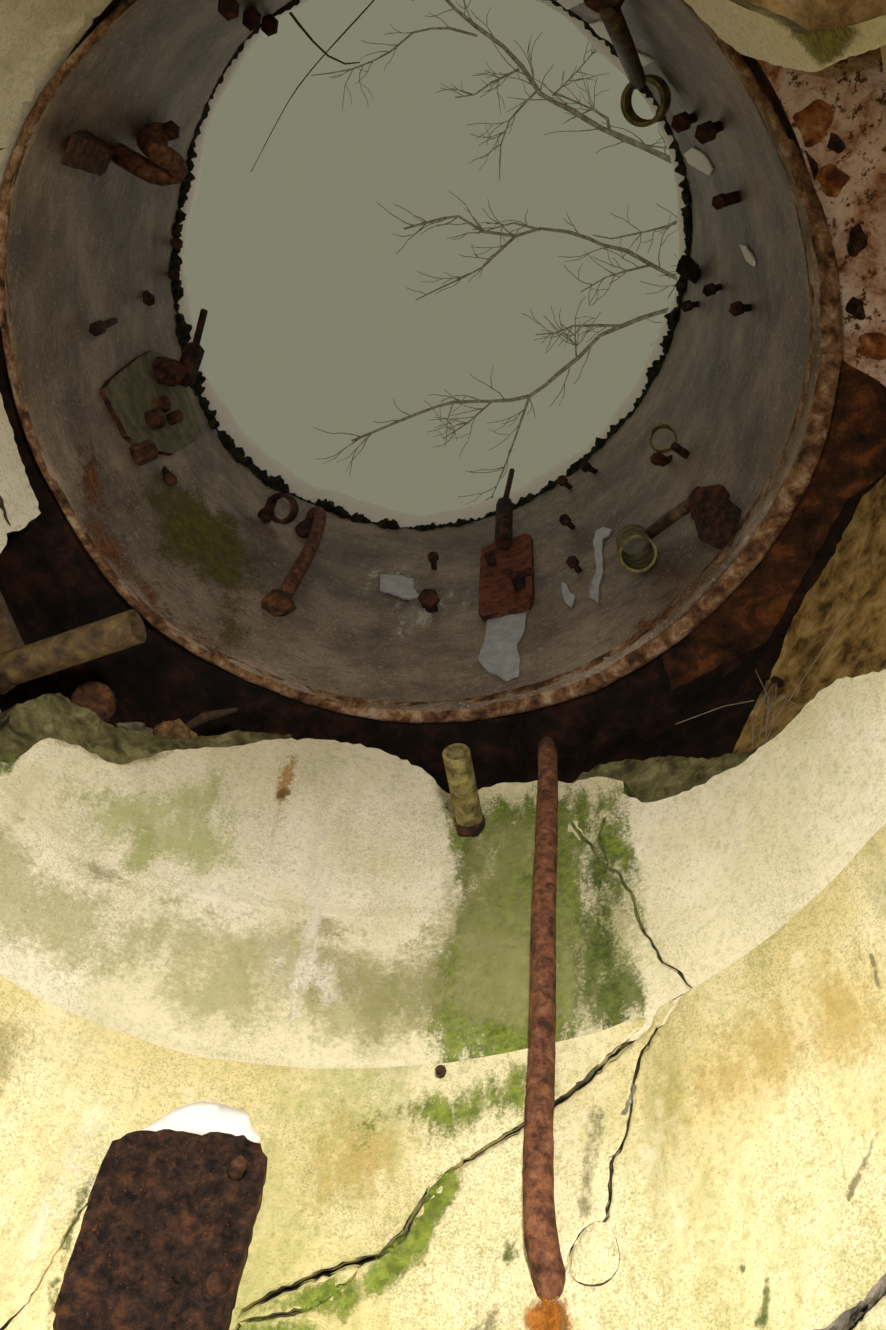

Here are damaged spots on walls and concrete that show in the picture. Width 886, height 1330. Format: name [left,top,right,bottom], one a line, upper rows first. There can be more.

corrosion [0,0,886,723]
crack [0,496,11,526]
spalling [0,693,292,765]
spalling [572,749,756,803]
leakage [455,837,481,934]
leakage [575,828,645,1033]
crack [576,817,691,988]
crack [554,1026,658,1261]
crack [0,1202,88,1330]
crack [233,1122,524,1330]
corrosion [524,1297,572,1330]
crack [813,1273,886,1330]